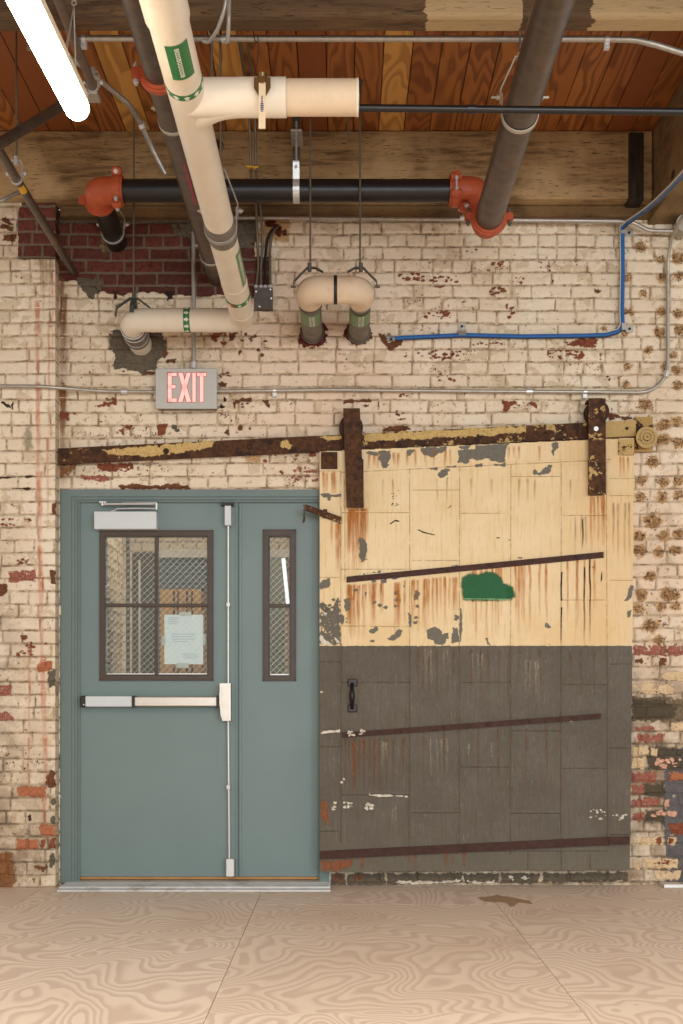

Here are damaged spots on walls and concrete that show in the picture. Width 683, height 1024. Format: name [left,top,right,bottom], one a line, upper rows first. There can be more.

peeling [378,333,463,382]
rust [655,419,683,448]
spalling [80,462,191,490]
peeling [407,442,509,478]
rust [336,509,367,539]
rust [347,583,382,615]
peeling [319,538,462,646]
rust [396,577,455,604]
flaking render [632,644,683,695]
flaking render [589,722,683,881]
flaking render [17,770,58,872]
water stain [395,879,532,907]